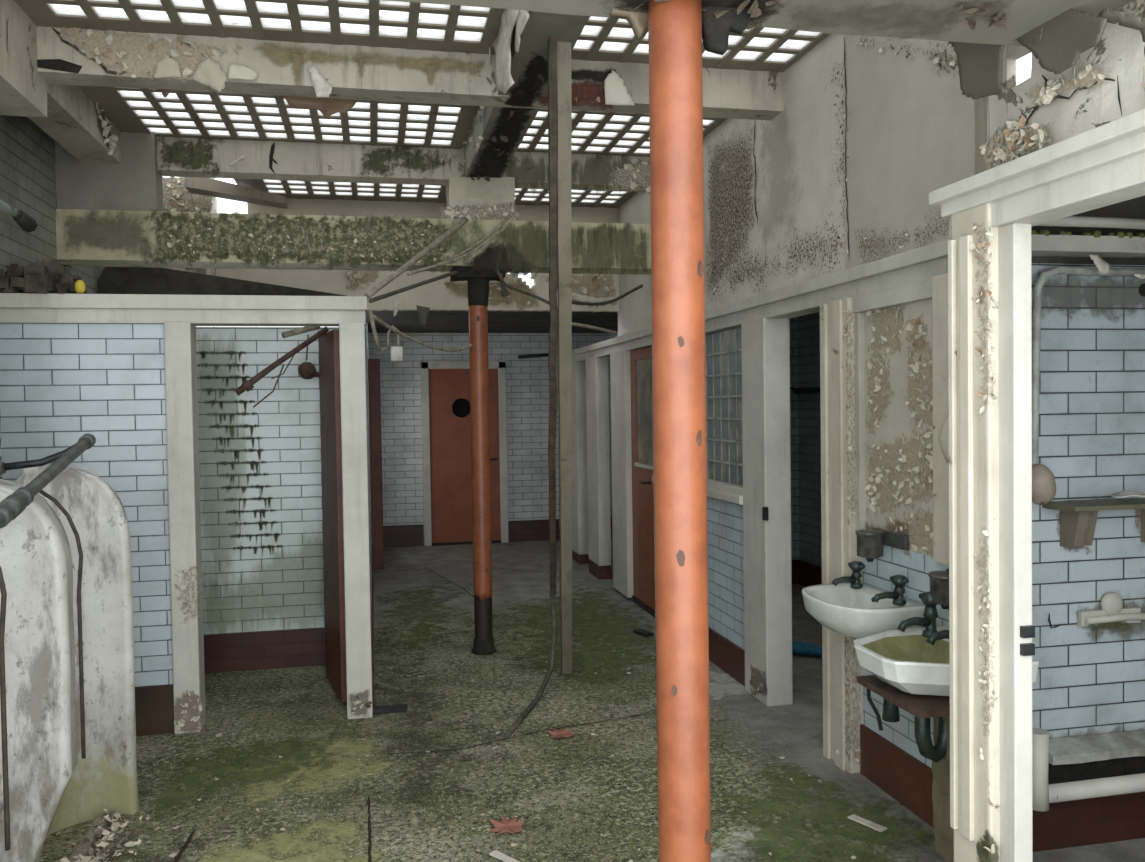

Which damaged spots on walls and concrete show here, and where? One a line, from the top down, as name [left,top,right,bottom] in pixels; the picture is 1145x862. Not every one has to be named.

spalling [1117,0,1145,21]
peeling [37,27,241,80]
crack [1025,75,1122,124]
leakage [65,212,151,256]
peeling [970,226,994,329]
peeling [974,348,998,414]
leakage [196,351,282,555]
peeling [843,305,933,557]
peeling [174,690,203,733]